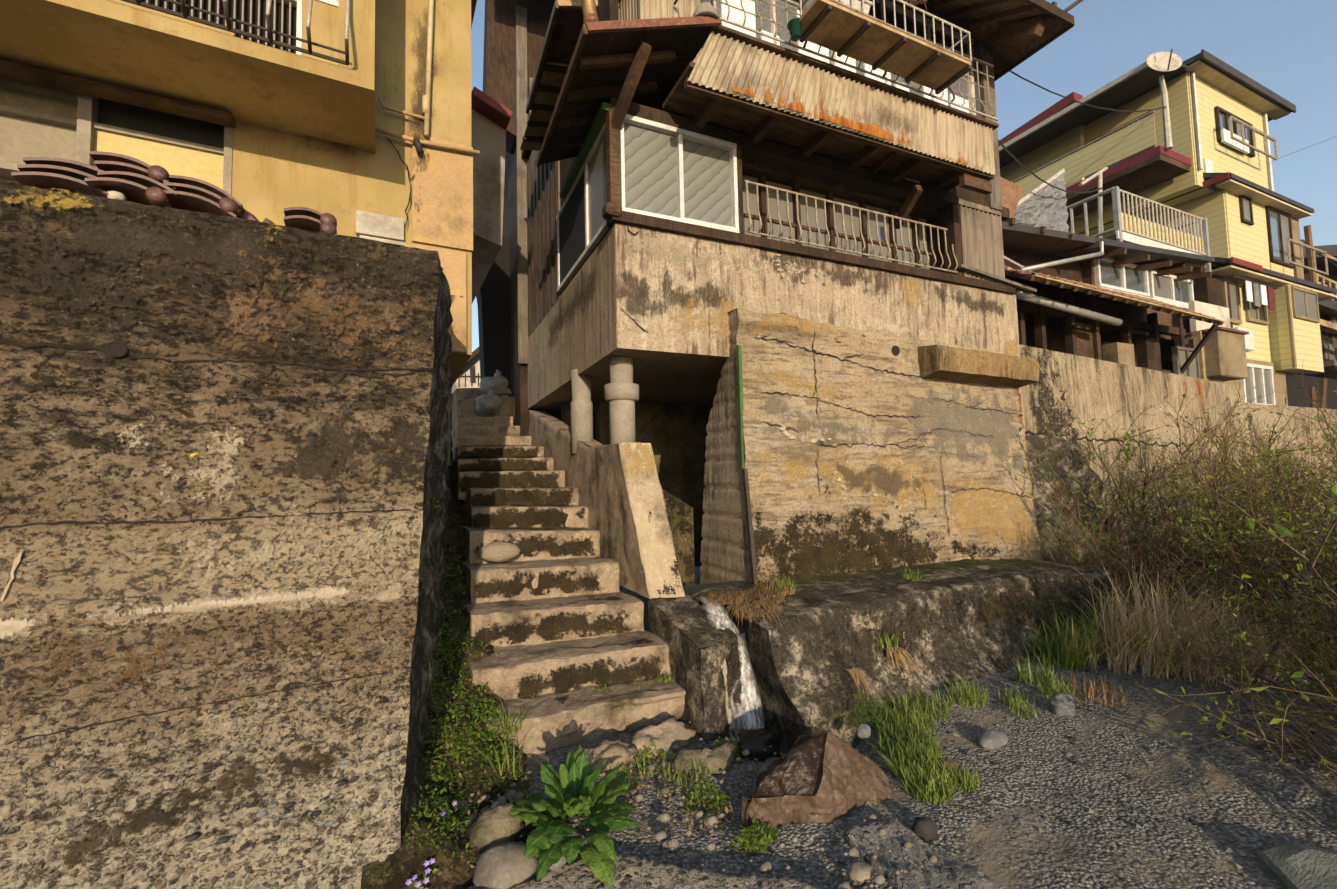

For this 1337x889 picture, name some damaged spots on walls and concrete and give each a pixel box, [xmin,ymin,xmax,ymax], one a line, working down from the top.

rust [729,70,914,146]
damp [616,232,1004,340]
damp [750,364,1034,547]
crack [0,509,411,528]
crack [14,672,387,741]